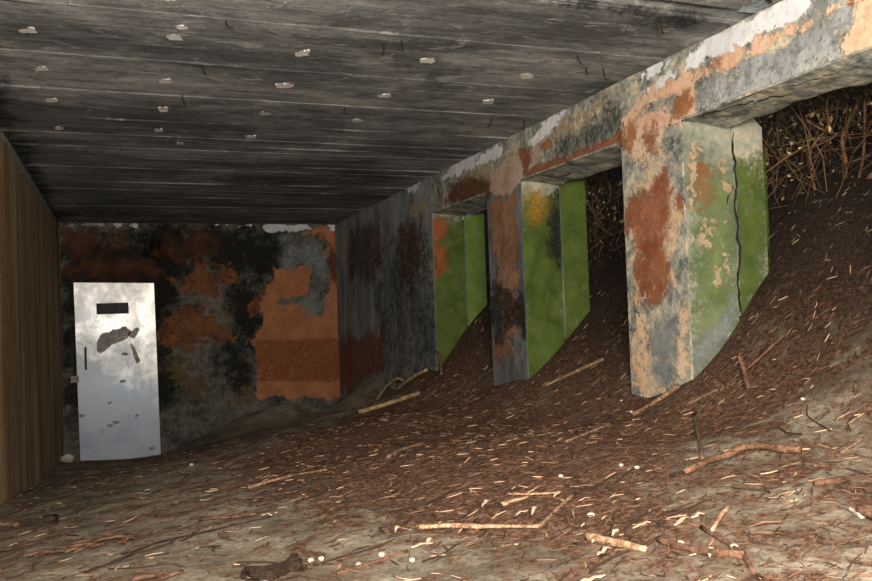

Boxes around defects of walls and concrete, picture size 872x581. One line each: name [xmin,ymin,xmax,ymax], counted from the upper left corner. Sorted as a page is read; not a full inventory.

leakage [0,76,70,219]
leakage [60,224,329,424]
peeling [156,260,240,404]
peeling [215,224,340,405]
corrosion [624,167,684,307]
crack [727,132,743,317]
spalling [619,0,872,398]
crack [696,73,837,119]